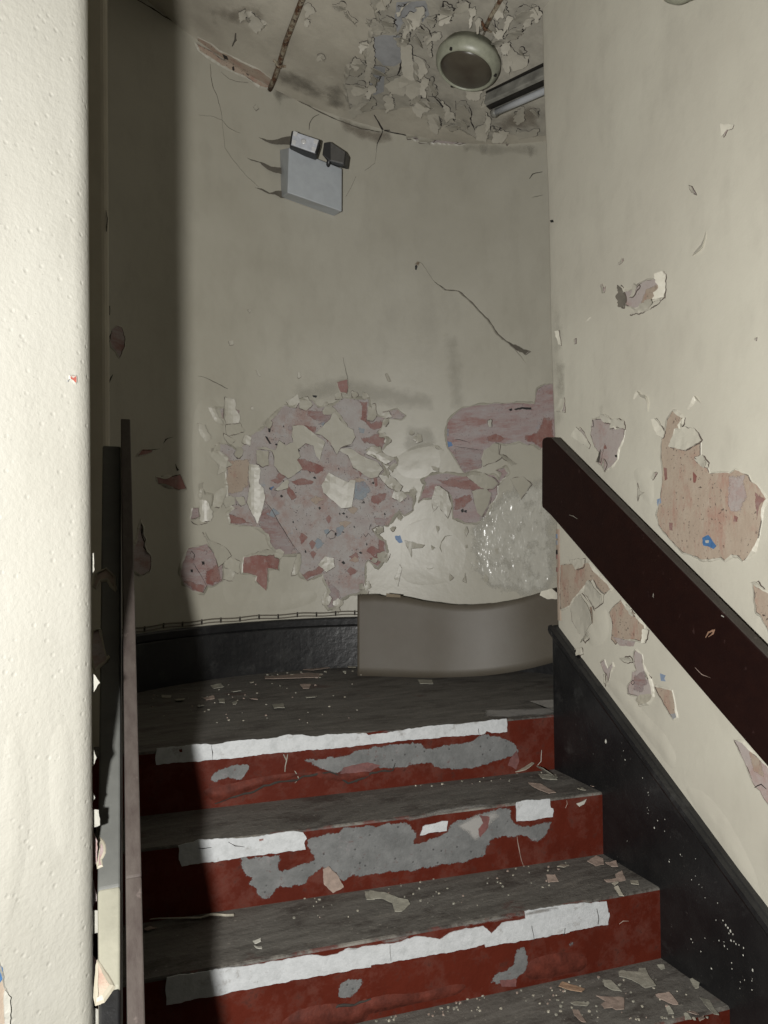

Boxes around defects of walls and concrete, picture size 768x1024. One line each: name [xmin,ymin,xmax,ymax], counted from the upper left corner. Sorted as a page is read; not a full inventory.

peeling [333,0,550,146]
crack [297,100,406,196]
crack [420,262,531,362]
peeling [155,379,566,614]
peeling [633,391,768,563]
peeling [540,529,678,722]
spalling [211,764,249,782]
spalling [305,734,558,794]
peeling [733,739,768,805]
spalling [241,808,552,899]
spalling [338,979,363,998]
spalling [491,947,528,987]